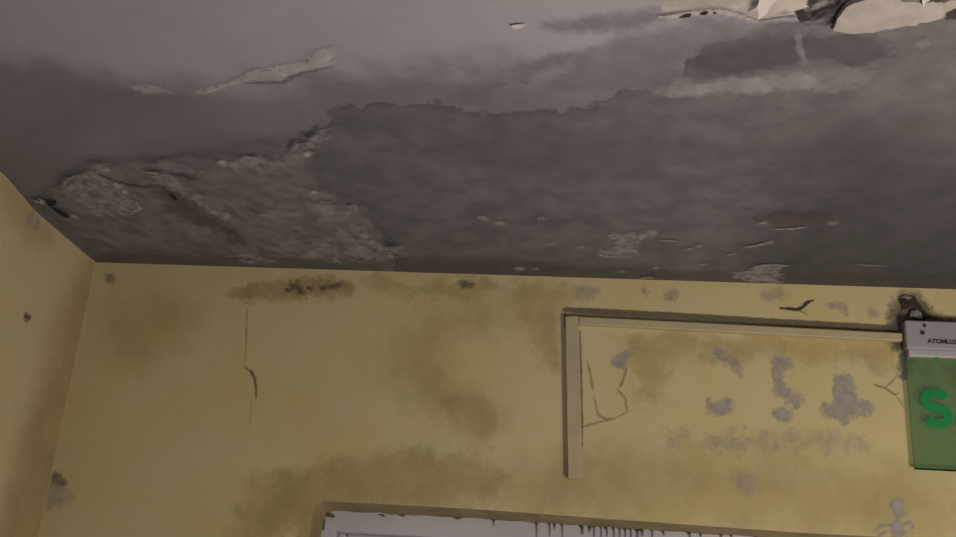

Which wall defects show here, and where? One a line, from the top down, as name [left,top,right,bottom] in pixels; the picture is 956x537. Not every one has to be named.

spalling [658,0,956,34]
peeling [196,47,336,94]
water stain [0,13,956,289]
water stain [240,262,353,298]
crack [779,300,814,311]
crack [247,369,257,396]
peeling [772,357,800,423]
peeling [823,374,872,425]
water stain [255,468,369,537]